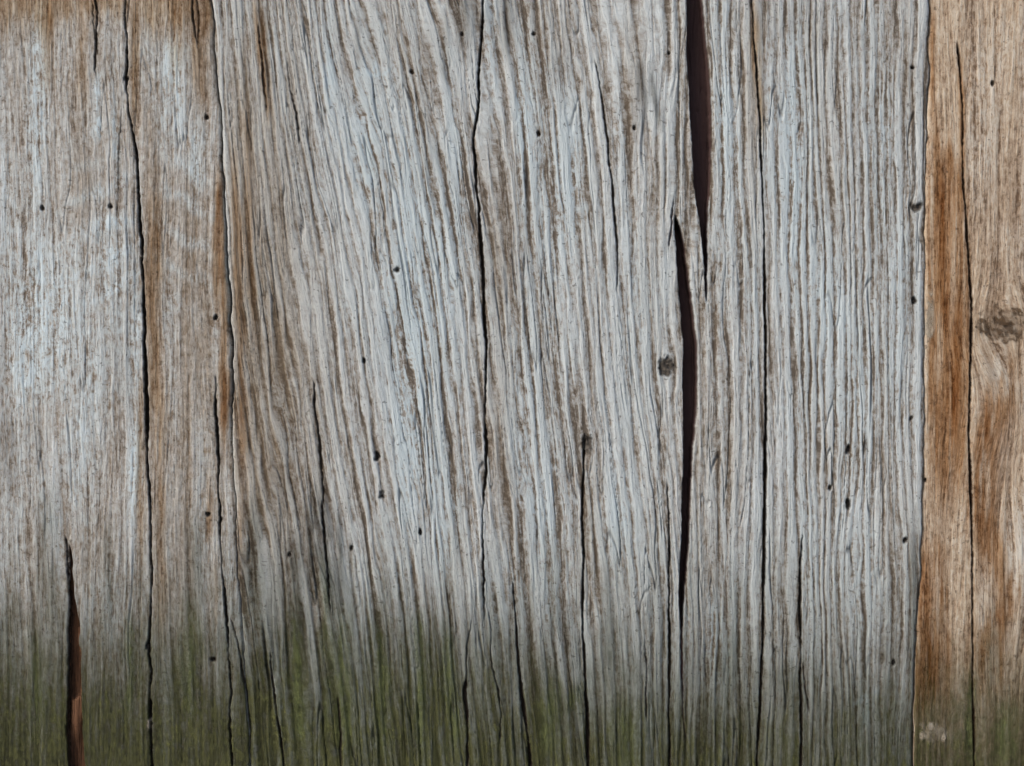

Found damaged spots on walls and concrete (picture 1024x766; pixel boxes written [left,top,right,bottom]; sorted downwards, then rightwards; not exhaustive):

crack [117,1,154,766]
crack [462,650,470,766]
crack [473,0,488,500]
crack [480,532,488,603]
crack [581,450,590,766]
crack [645,0,712,766]
crack [957,47,975,766]